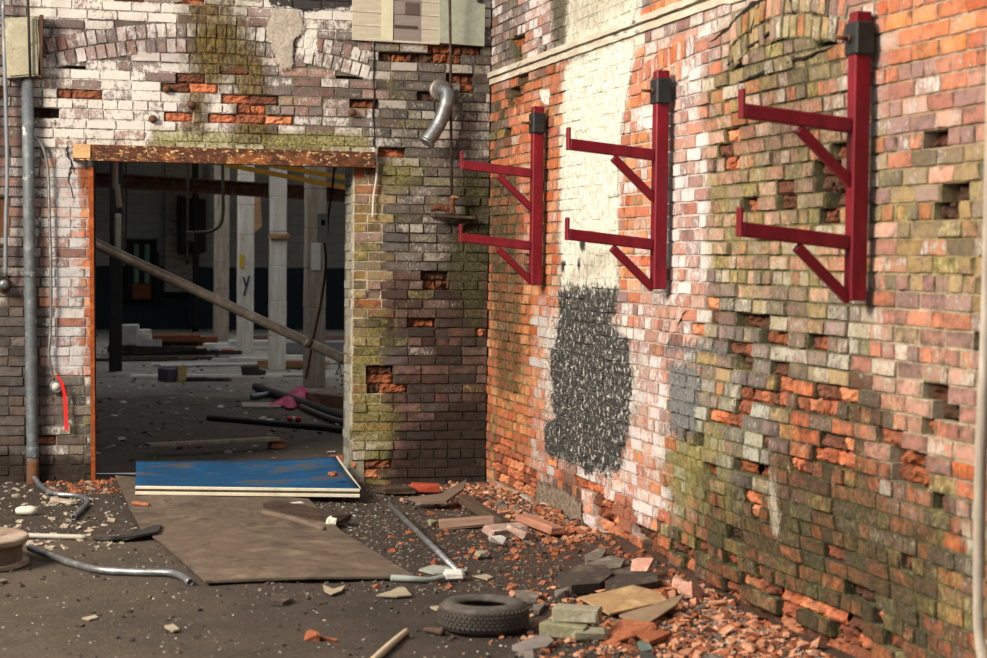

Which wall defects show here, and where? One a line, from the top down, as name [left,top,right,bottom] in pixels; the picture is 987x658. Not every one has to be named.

damp [186,28,265,131]
spalling [513,36,526,61]
crack [709,0,833,82]
damp [233,106,267,141]
peeling [539,0,874,658]
spalling [366,365,407,393]
spalling [929,383,960,434]
damp [396,401,487,485]
spalling [492,435,537,498]
spalling [882,428,930,487]
damp [768,476,781,535]
damp [951,498,973,569]